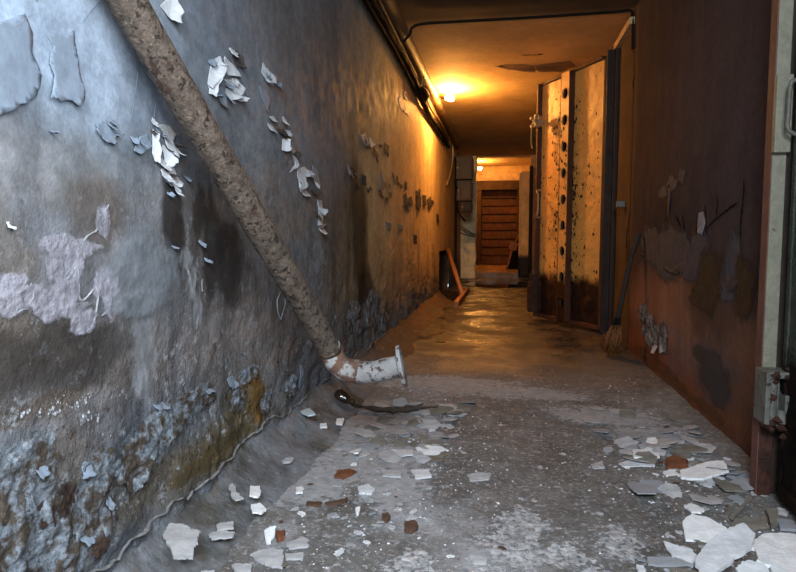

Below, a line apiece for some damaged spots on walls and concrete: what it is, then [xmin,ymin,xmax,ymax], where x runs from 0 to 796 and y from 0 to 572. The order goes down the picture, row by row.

peeling [160,0,184,24]
peeling [0,14,42,116]
peeling [47,31,85,106]
peeling [207,48,251,110]
peeling [96,117,193,197]
peeling [259,63,328,235]
peeling [347,133,439,223]
flaking render [641,168,710,283]
flaking render [227,361,259,413]
flaking render [259,387,273,415]
corrosion [760,416,788,441]
flaking render [0,381,217,572]